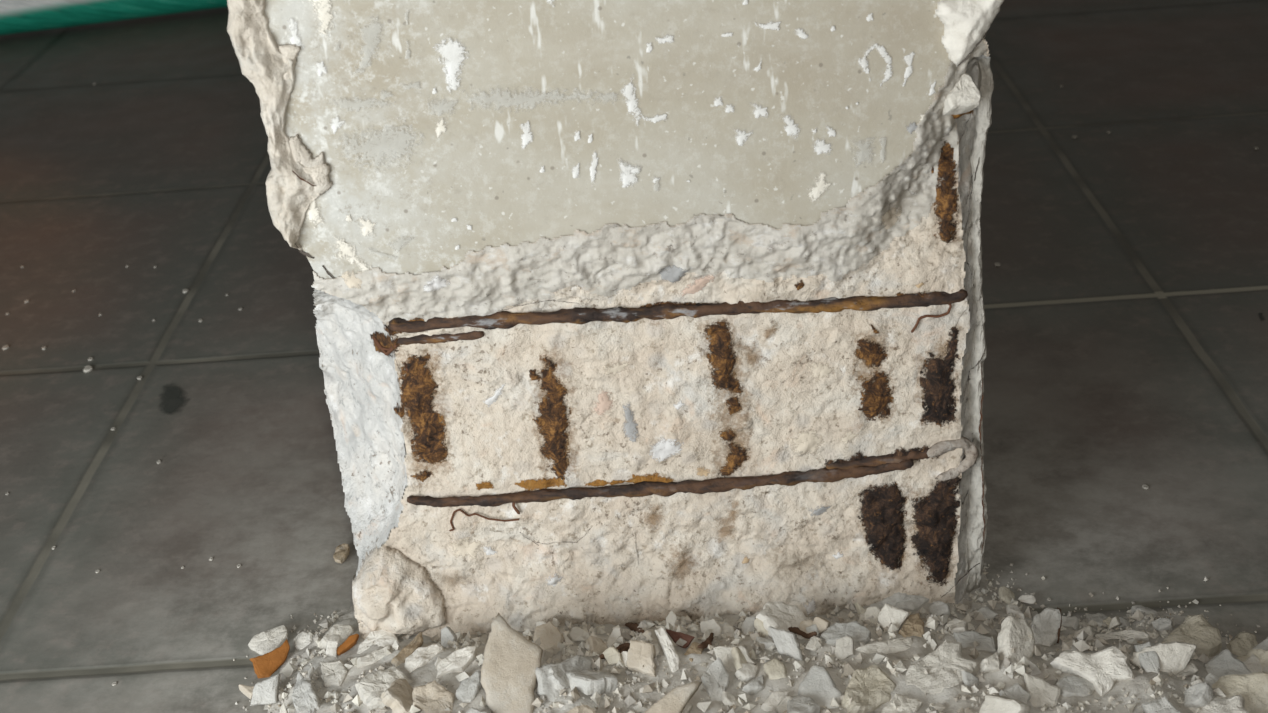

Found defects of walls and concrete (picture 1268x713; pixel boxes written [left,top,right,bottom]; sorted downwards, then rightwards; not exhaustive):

rust [931,140,959,244]
rust [370,318,448,482]
rust [476,481,494,490]
rust [515,356,576,491]
rust [585,473,675,487]
spalling [310,0,1004,713]
rust [704,320,756,478]
rust [825,451,867,468]
rust [853,324,894,422]
rust [858,477,961,586]
rust [890,446,940,462]
rust [919,327,960,427]